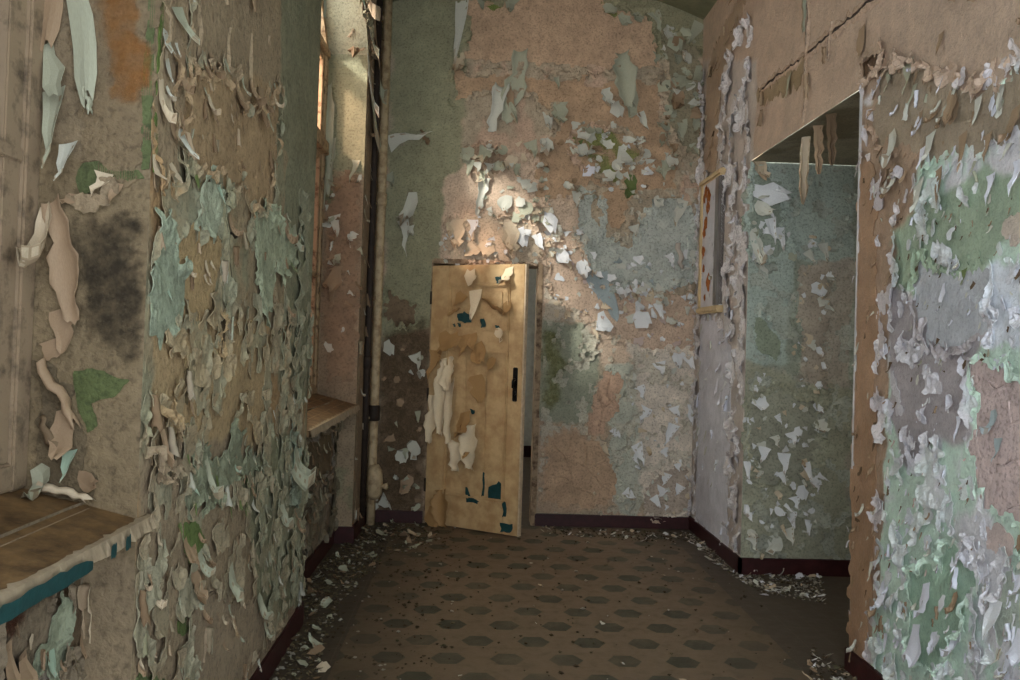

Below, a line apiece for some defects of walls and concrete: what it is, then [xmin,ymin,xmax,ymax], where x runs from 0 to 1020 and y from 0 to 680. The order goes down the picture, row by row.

damp [78,218,142,341]
flaking render [16,0,305,503]
flaking render [137,425,336,680]
peeling [347,0,478,528]
flaking render [439,0,838,601]
crack [743,0,881,158]
peeling [846,24,1020,680]